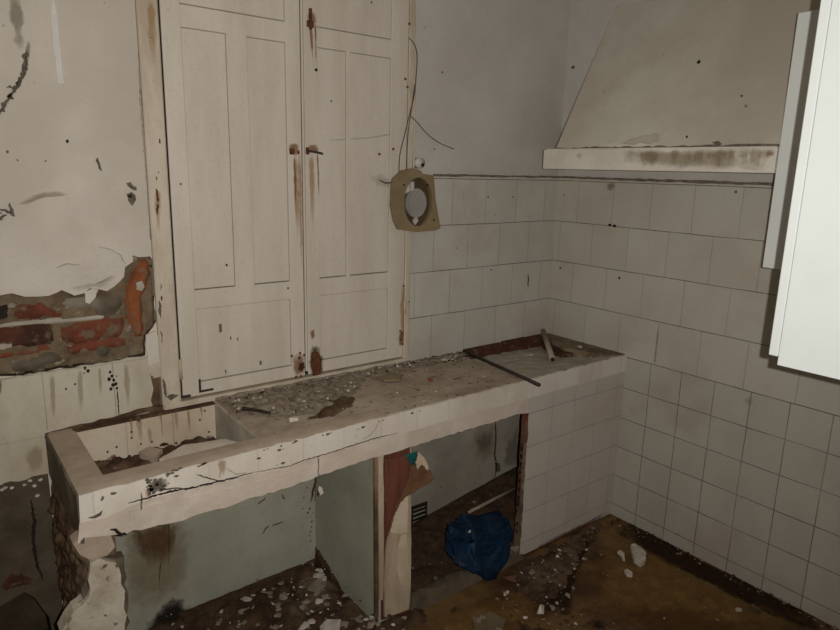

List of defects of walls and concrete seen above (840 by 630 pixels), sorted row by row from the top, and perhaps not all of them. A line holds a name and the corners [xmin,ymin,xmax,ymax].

crack [0,50,29,114]
flaking render [0,256,178,406]
rust [291,348,322,378]
crack [128,422,396,510]
crack [30,500,44,581]
leakage [137,524,174,581]